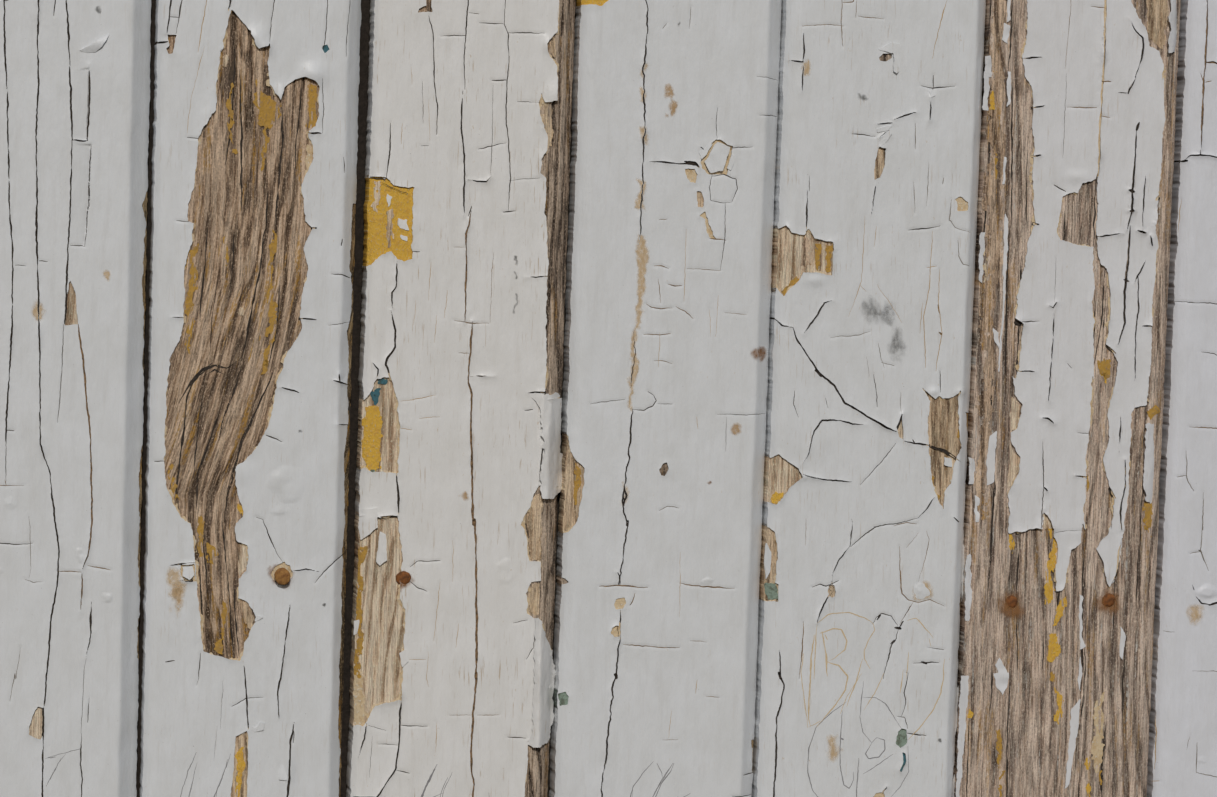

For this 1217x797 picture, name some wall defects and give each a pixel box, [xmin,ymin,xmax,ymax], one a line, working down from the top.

crack [0,0,110,797]
peeling [231,728,249,797]
peeling [164,9,319,661]
peeling [338,175,414,797]
crack [373,0,539,797]
peeling [521,0,608,797]
crack [592,0,748,797]
peeling [771,226,834,296]
crack [734,499,959,797]
crack [773,75,969,485]
peeling [923,0,1181,797]
crack [1179,9,1217,163]